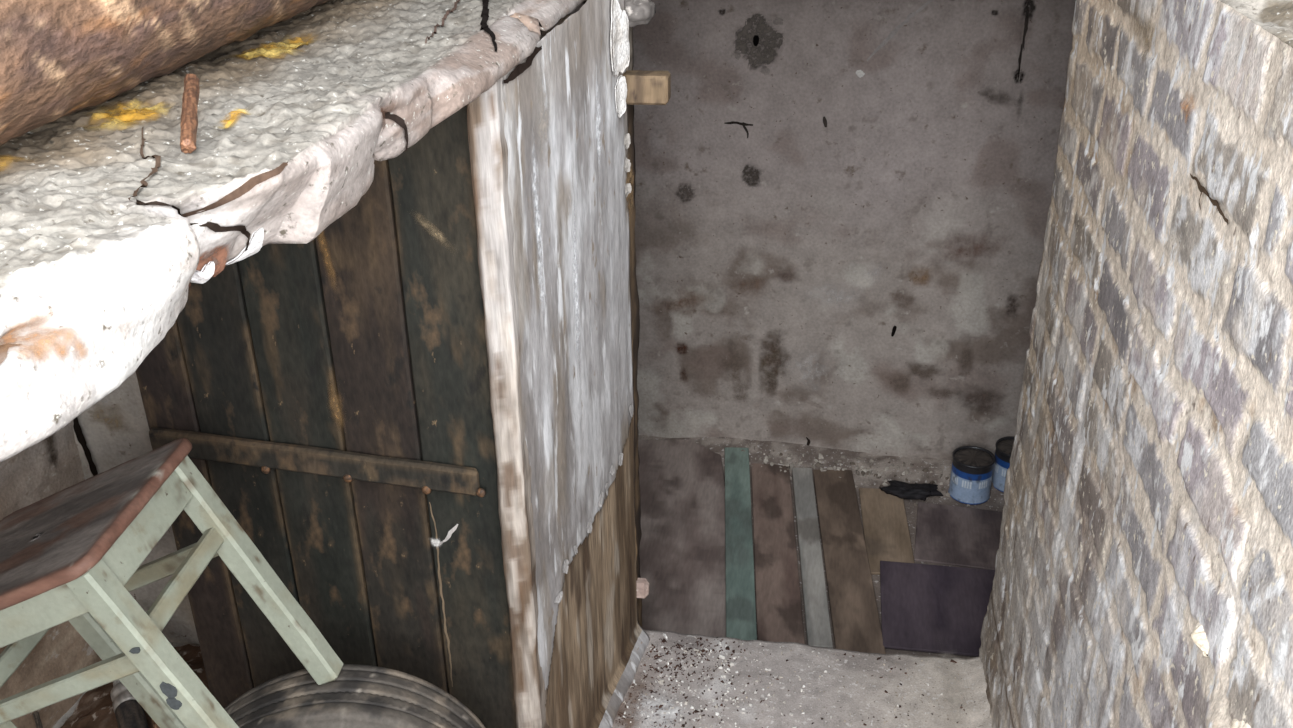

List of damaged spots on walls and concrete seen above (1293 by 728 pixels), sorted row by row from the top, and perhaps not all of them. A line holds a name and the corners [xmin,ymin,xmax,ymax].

crack [425,0,497,52]
crack [128,126,288,251]
water stain [761,335,782,383]
crack [73,417,98,476]